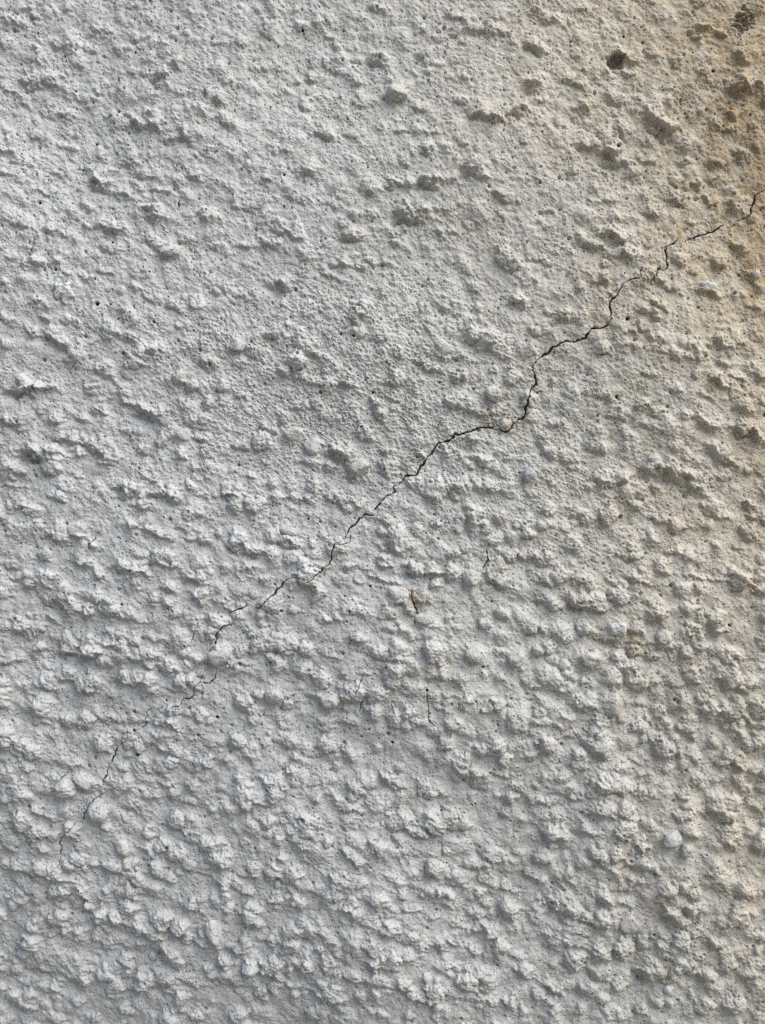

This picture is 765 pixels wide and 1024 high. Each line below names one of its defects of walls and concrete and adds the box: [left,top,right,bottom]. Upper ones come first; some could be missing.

crack [50,190,765,873]